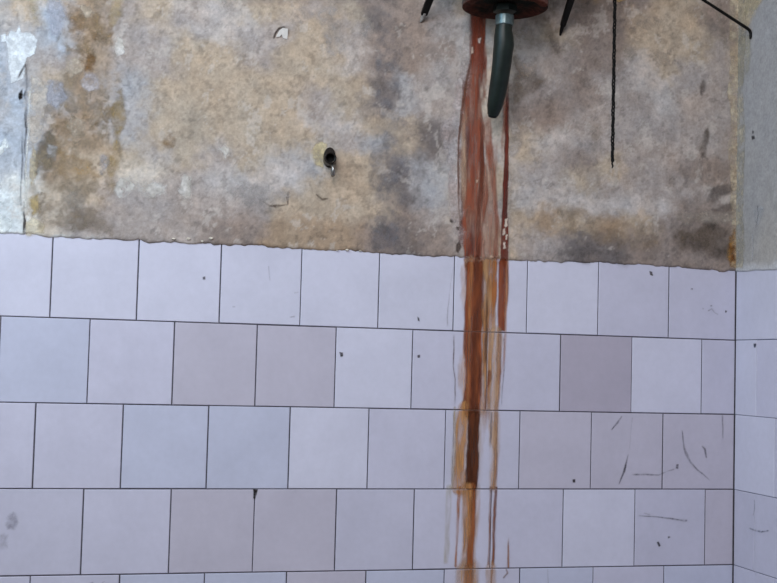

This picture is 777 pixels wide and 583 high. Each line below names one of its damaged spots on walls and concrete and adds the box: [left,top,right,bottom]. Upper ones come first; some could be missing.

peeling [1,28,47,179]
leakage [36,125,65,176]
leakage [47,5,123,167]
rust [454,15,509,583]